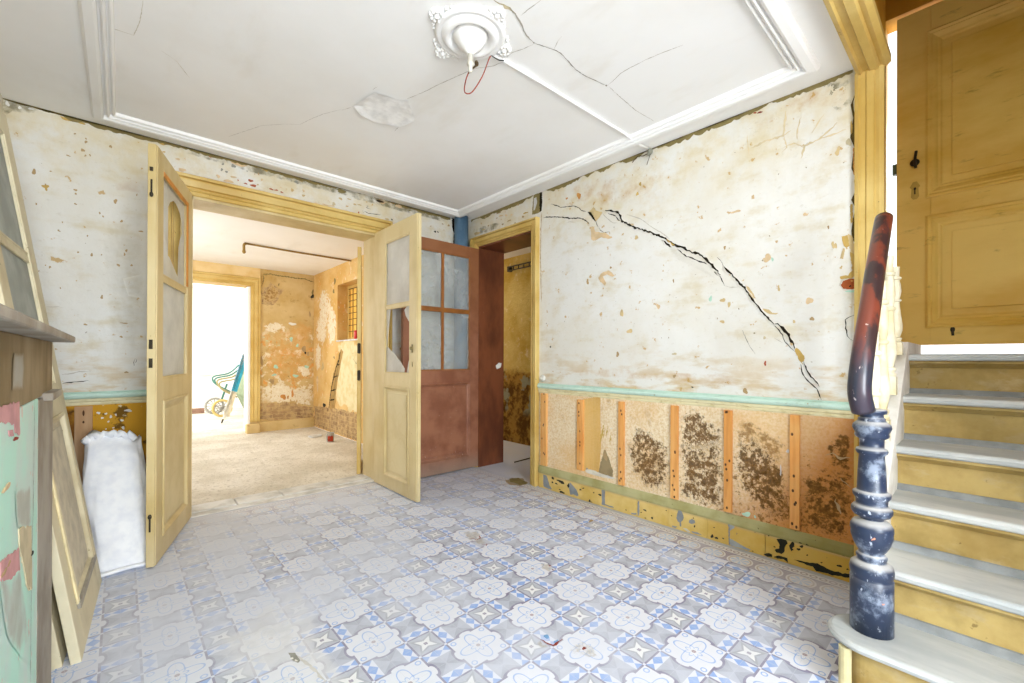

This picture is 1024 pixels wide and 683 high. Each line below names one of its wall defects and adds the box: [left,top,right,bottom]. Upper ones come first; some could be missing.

peeling [354,93,415,128]
crack [410,0,682,120]
peeling [260,278,357,440]
crack [546,204,821,398]
peeling [831,204,854,292]
flaking render [543,450,615,508]
water stain [627,407,852,541]
peeling [666,510,849,578]